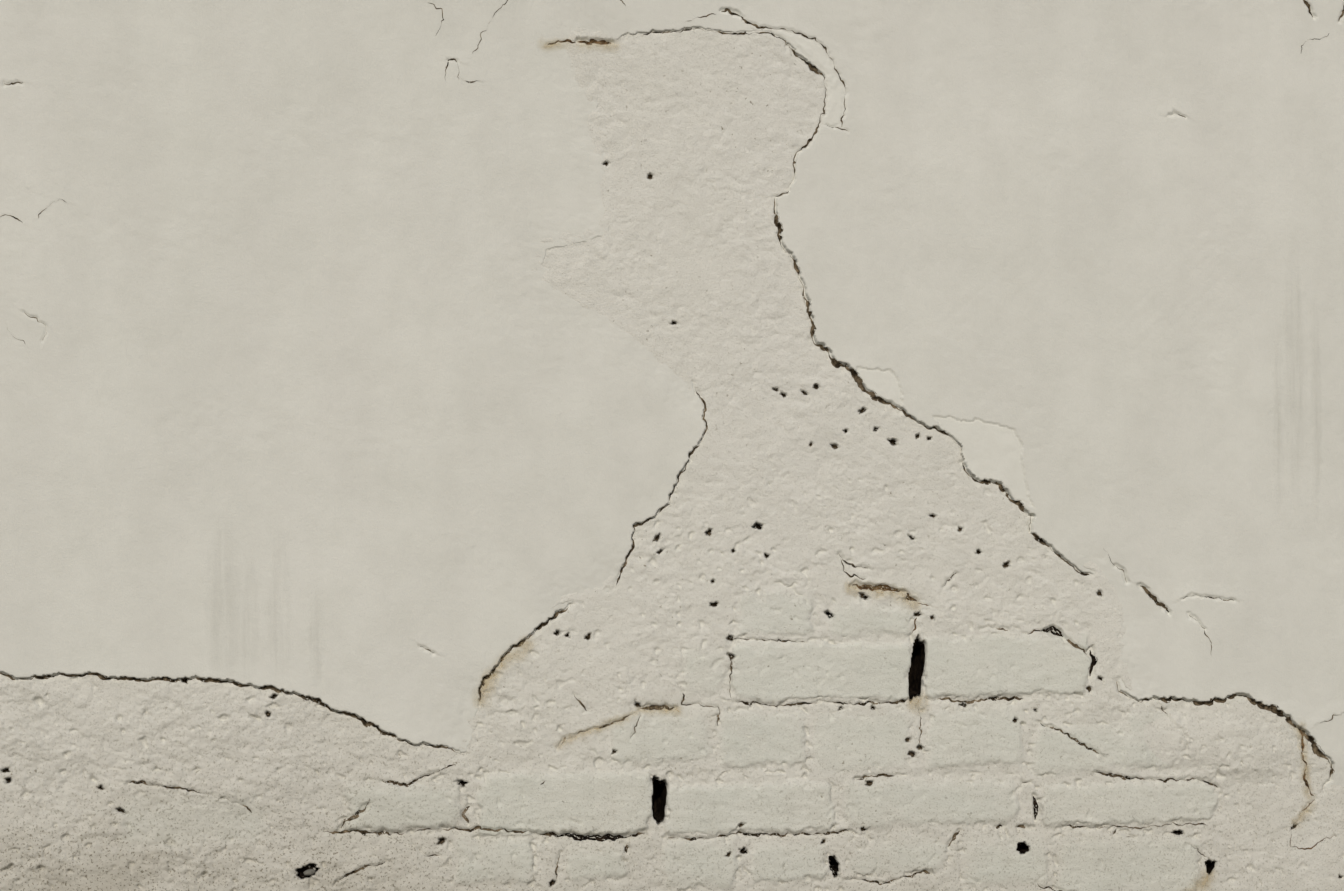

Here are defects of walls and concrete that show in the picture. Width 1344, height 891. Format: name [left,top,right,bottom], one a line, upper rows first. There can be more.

crack [430,0,508,83]
crack [548,38,610,46]
crack [690,8,846,130]
spalling [829,355,902,410]
spalling [935,417,1031,506]
spalling [196,677,251,687]
spalling [294,693,336,712]
spalling [337,712,396,738]
spalling [1193,694,1237,706]
spalling [1244,696,1297,728]
spalling [1298,728,1329,761]
crack [1290,714,1334,850]